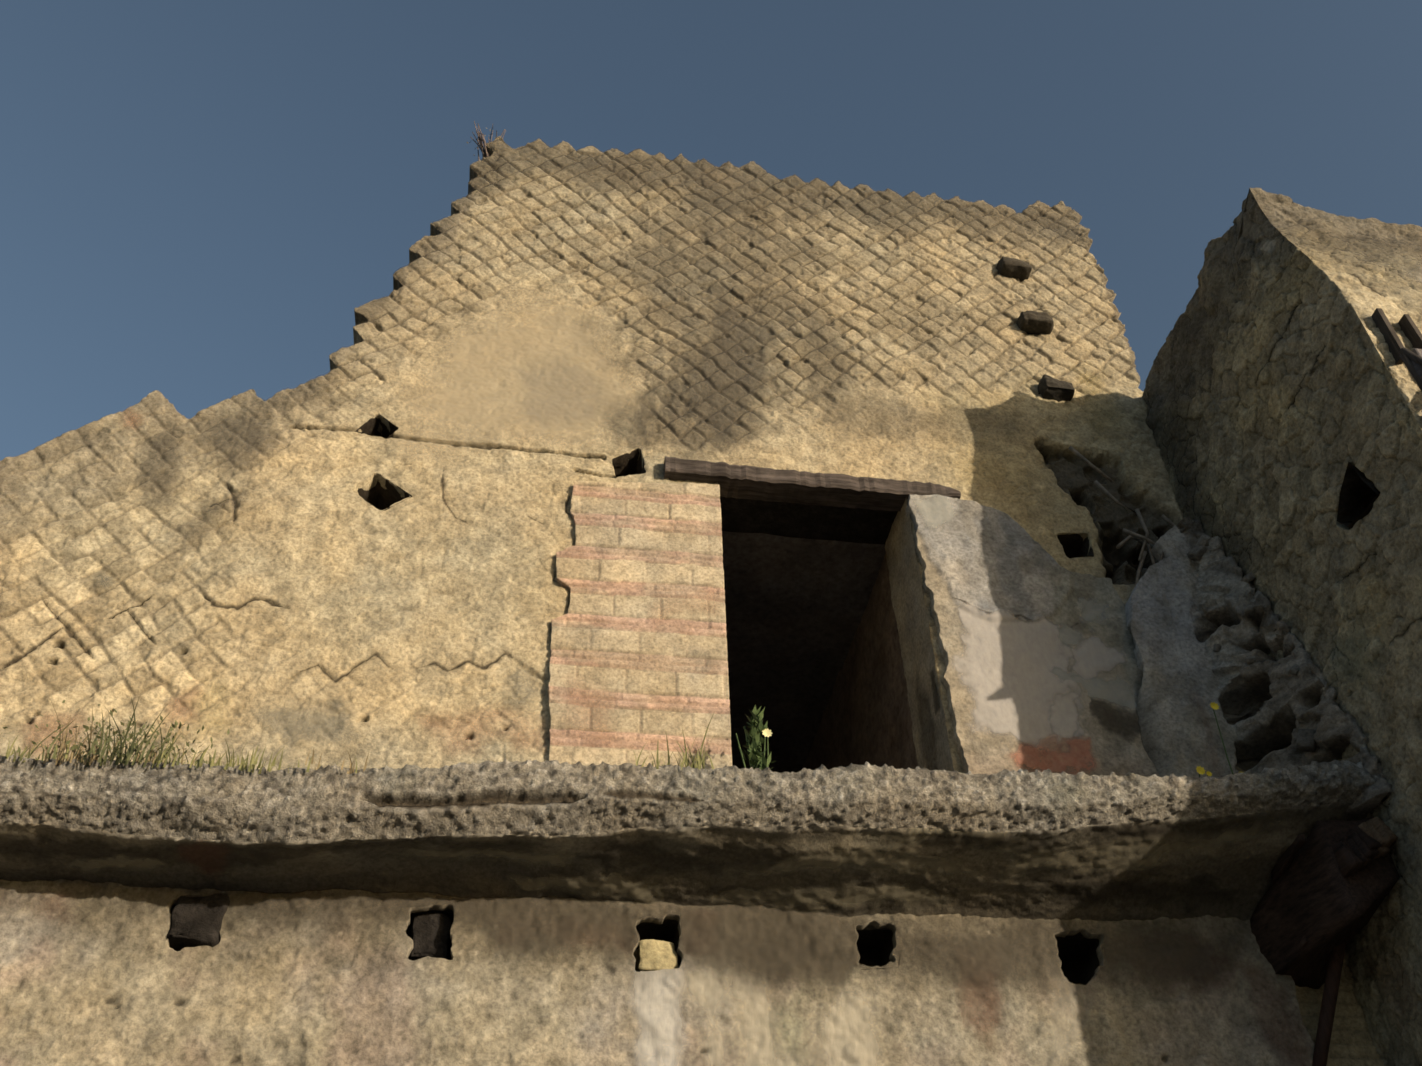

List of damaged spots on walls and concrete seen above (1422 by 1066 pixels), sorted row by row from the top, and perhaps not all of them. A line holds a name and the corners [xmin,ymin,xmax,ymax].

crack [211,486,237,522]
crack [206,598,280,610]
peeling [906,494,1160,777]
crack [301,653,387,682]
crack [421,653,513,671]
damp [0,811,1282,1066]